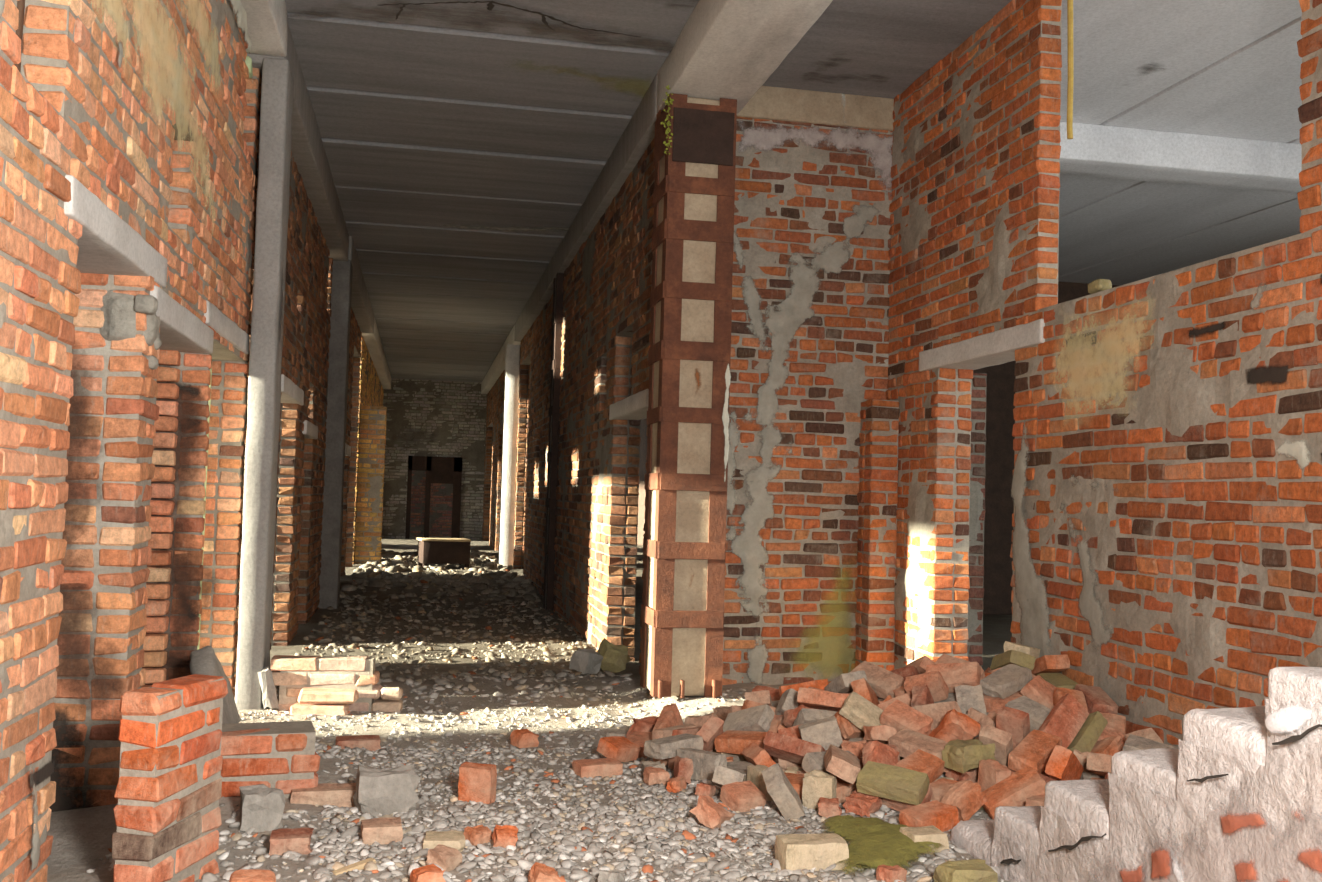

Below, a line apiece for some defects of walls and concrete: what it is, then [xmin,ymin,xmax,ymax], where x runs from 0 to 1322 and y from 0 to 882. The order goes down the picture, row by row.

crack [379,1,639,37]
spalling [1247,365,1288,384]
flaking render [1265,706,1310,733]
crack [1272,724,1322,745]
crack [1187,774,1229,783]
crack [1000,833,1106,865]
flaking render [1090,794,1322,882]